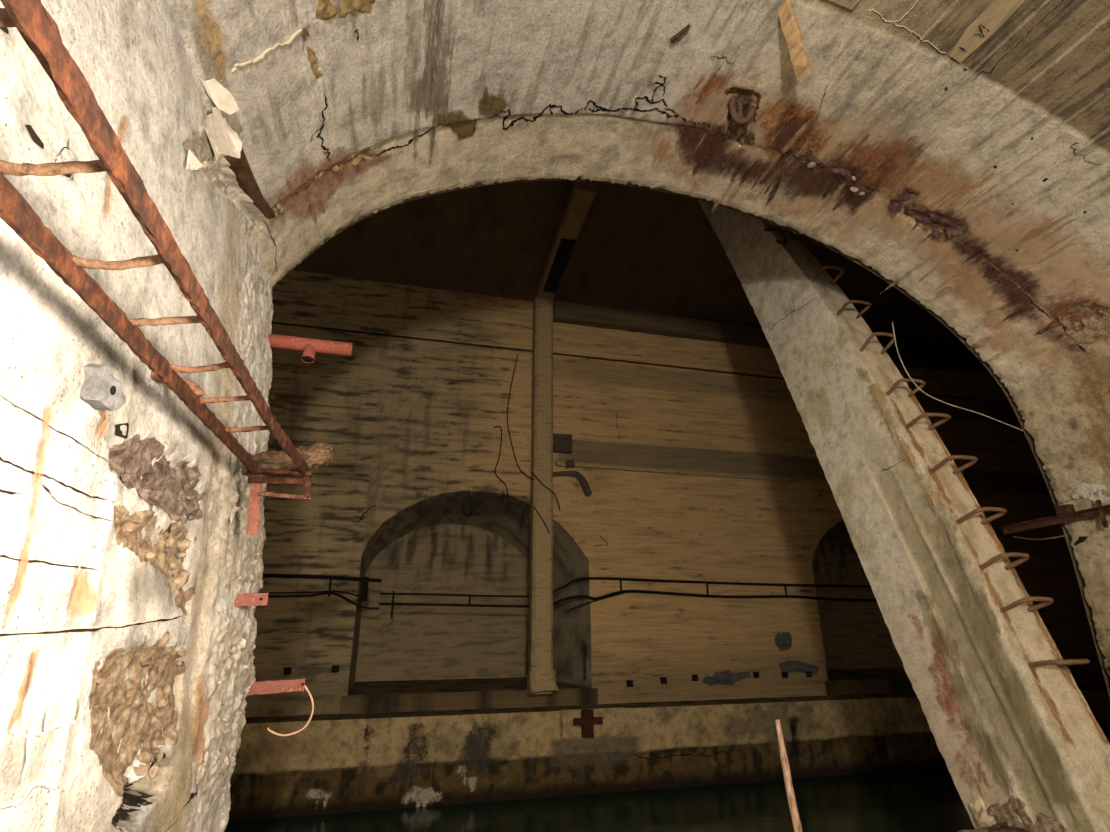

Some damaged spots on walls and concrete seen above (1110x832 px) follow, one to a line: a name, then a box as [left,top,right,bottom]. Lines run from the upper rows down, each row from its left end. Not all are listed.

spalling [315,0,376,20]
spalling [302,29,323,79]
crack [311,95,330,161]
crack [363,75,705,160]
rust [653,64,1110,359]
spalling [1058,304,1110,345]
crack [0,457,114,521]
spalling [108,434,267,616]
crack [0,555,100,571]
spalling [89,631,187,832]
water stain [389,724,441,807]
water stain [456,722,496,791]